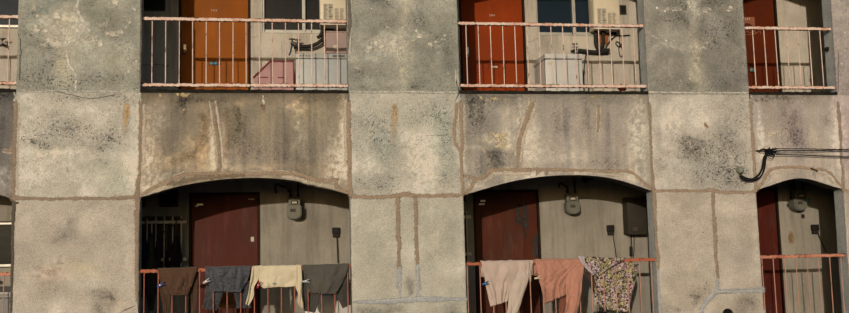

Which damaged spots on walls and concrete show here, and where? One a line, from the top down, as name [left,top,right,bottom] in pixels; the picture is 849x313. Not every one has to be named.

crack [2,81,849,313]